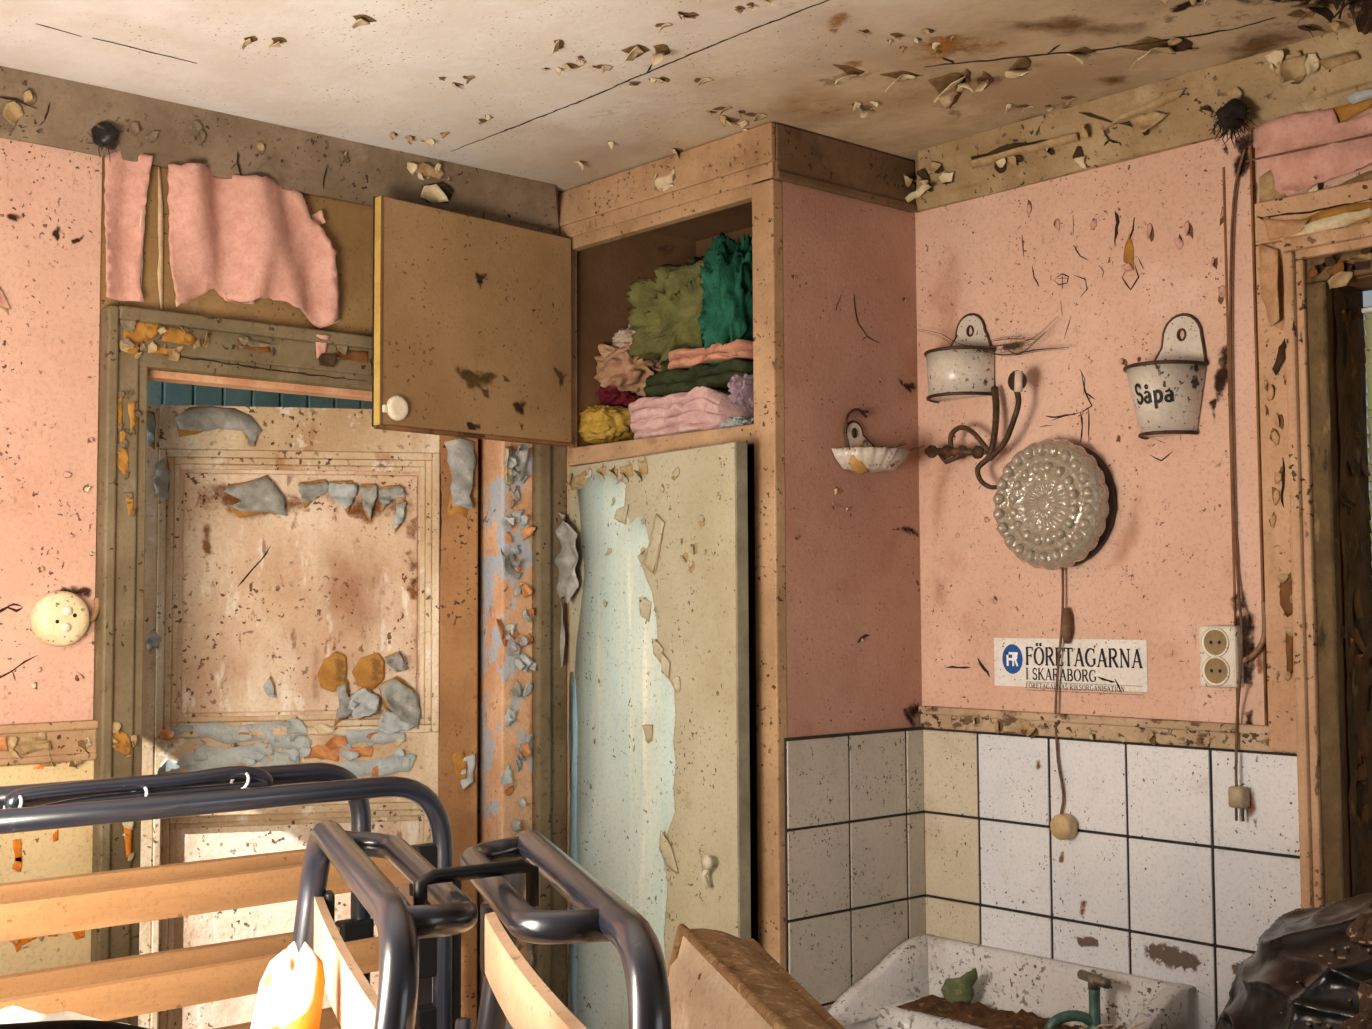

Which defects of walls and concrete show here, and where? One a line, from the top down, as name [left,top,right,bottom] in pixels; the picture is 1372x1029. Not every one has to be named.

peeling [541,0,701,87]
water stain [1024,19,1102,31]
water stain [1171,0,1201,13]
water stain [1235,35,1288,59]
water stain [1240,0,1363,8]
peeling [832,56,1032,118]
peeling [119,320,210,362]
peeling [223,475,406,534]
peeling [496,445,537,727]
peeling [157,651,420,777]
peeling [554,457,681,959]
peeling [568,942,629,1029]